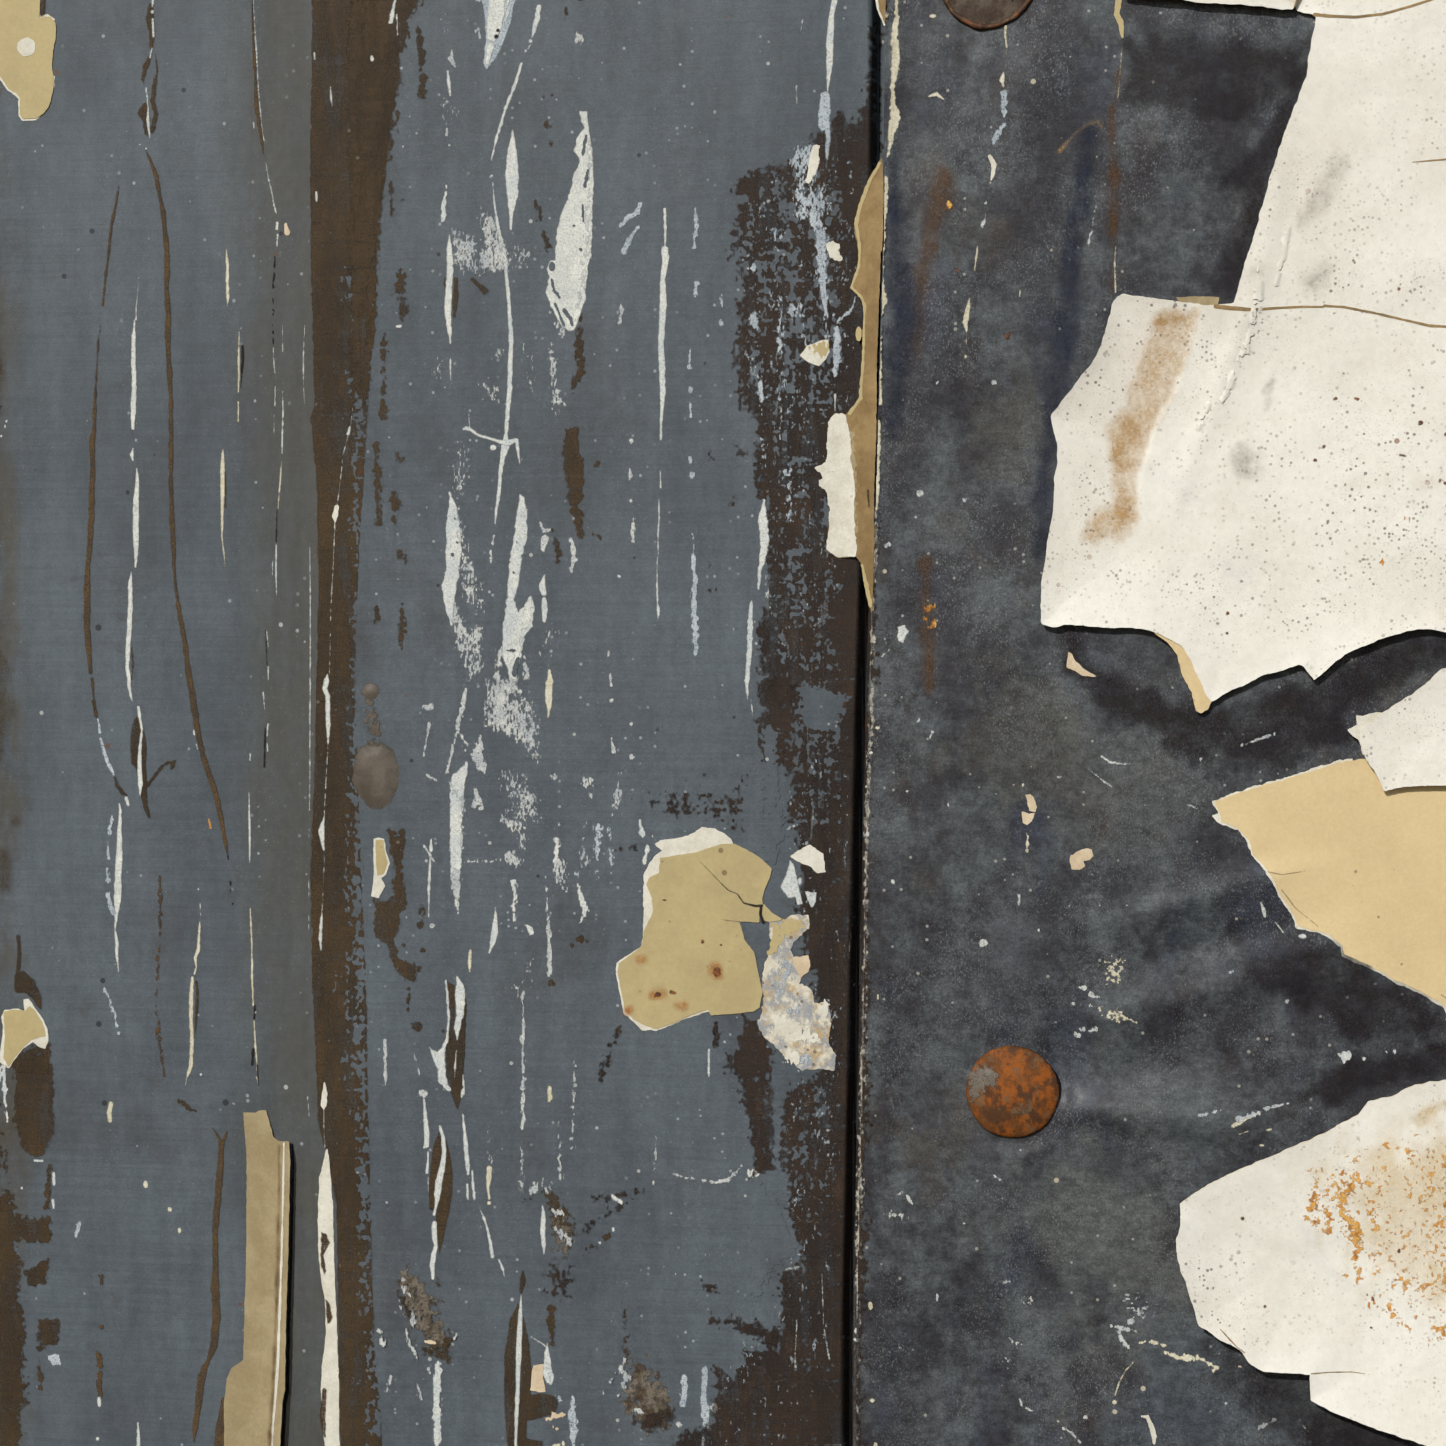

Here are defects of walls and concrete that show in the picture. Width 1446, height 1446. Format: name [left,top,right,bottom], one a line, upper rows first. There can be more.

peeling [0,0,56,121]
crack [1294,0,1432,19]
spalling [534,135,593,327]
peeling [1040,0,1446,713]
crack [1214,304,1446,328]
peeling [598,22,891,1446]
peeling [897,625,908,642]
peeling [1348,668,1446,791]
peeling [224,1110,296,1446]
peeling [1176,1079,1446,1446]
corrosion [1305,1134,1446,1341]